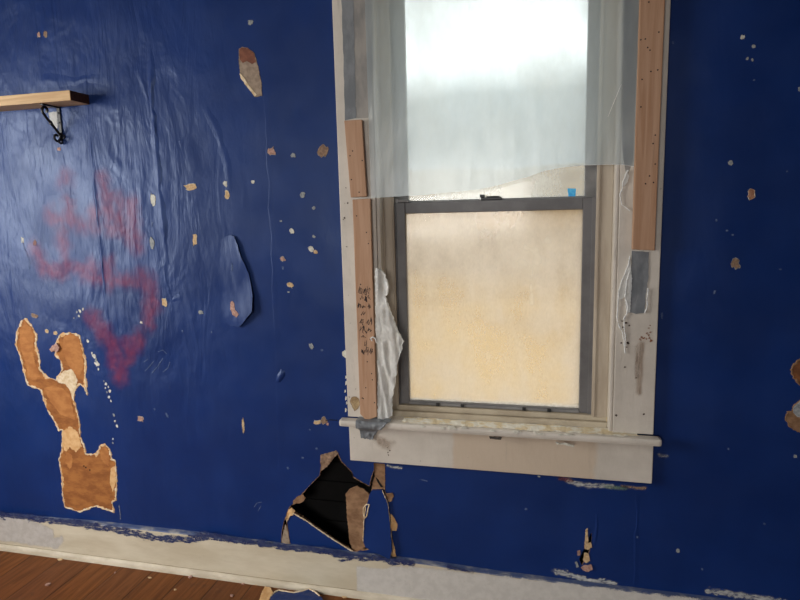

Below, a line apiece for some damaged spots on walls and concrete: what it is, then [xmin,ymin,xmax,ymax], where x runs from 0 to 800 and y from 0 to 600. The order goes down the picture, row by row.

spalling [281,448,397,559]
spalling [575,514,599,572]